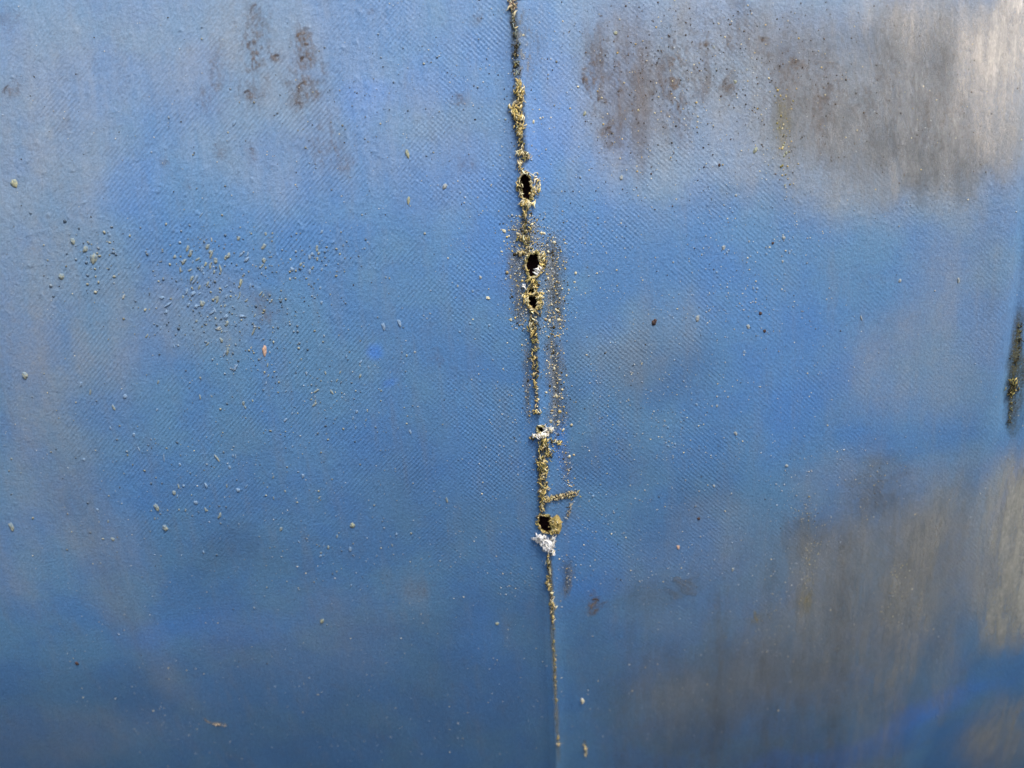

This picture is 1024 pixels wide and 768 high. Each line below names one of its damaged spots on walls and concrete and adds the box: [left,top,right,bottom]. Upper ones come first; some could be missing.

crack [506,0,532,174]
water stain [870,0,1023,184]
crack [516,205,534,252]
crack [525,308,581,520]
crack [545,552,560,746]